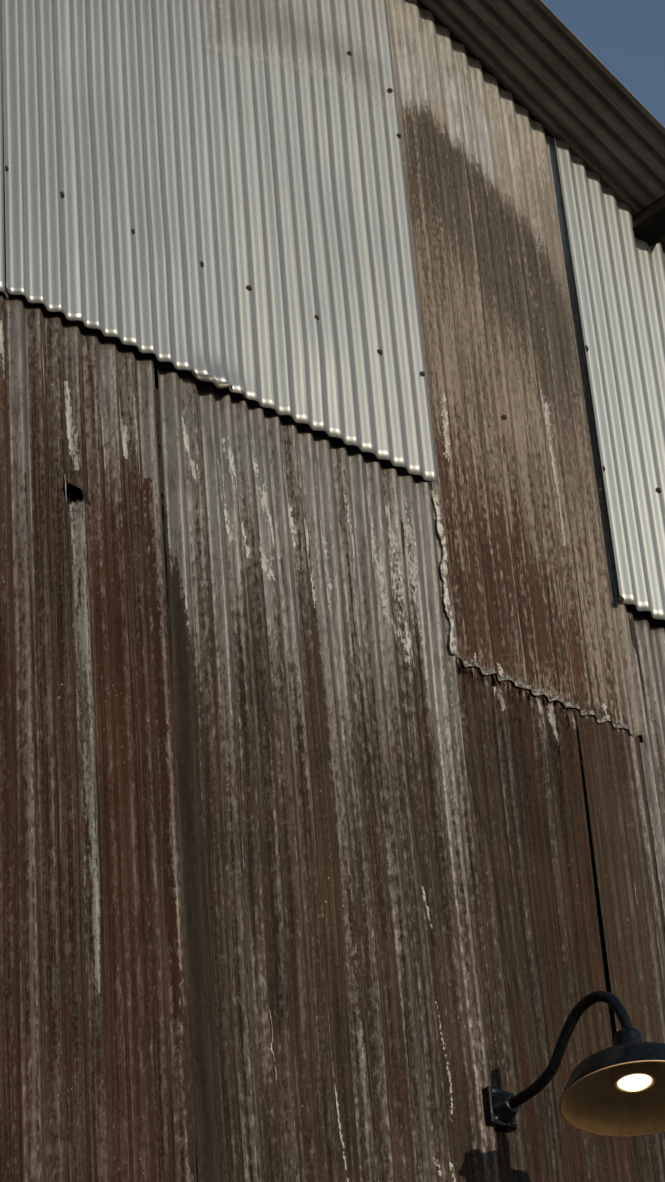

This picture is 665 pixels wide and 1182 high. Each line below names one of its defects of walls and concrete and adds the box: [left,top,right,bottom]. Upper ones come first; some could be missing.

rust [398,93,660,799]
rust [347,875,378,1152]